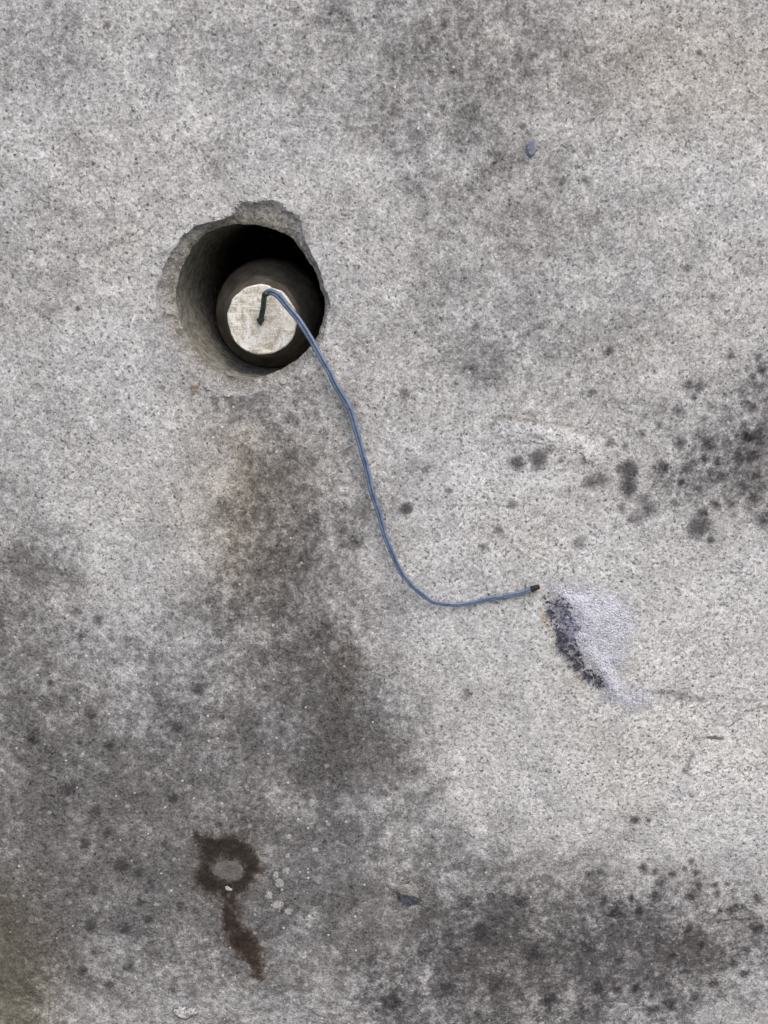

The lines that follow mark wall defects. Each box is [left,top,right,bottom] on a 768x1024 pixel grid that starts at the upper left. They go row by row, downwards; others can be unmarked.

water stain [265,853,293,915]